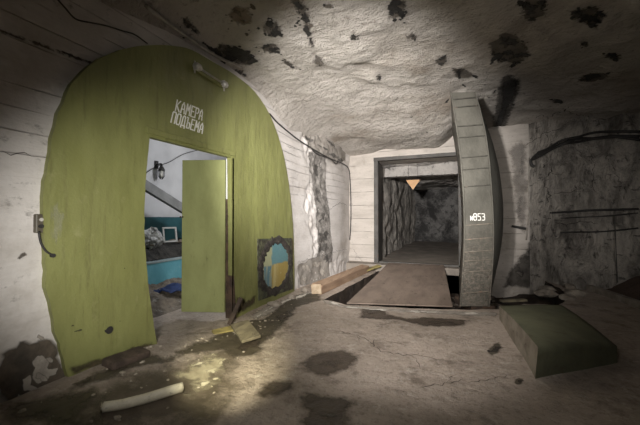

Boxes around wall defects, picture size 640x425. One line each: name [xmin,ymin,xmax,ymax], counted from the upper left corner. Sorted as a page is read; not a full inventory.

water stain [488,80,518,127]
peeling [0,335,65,401]
water stain [9,291,497,425]
crack [342,331,507,387]